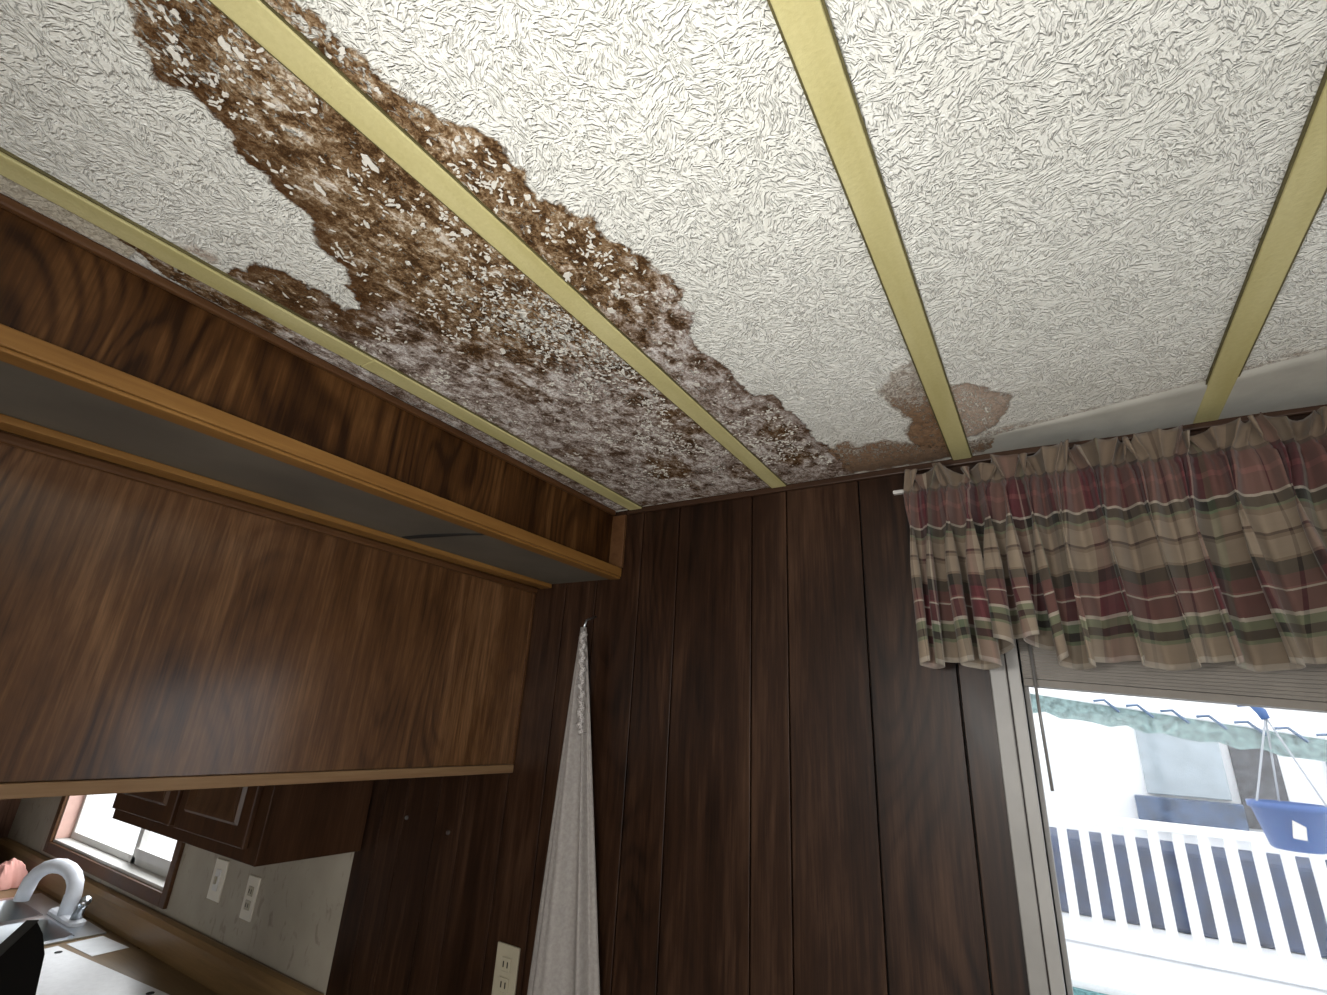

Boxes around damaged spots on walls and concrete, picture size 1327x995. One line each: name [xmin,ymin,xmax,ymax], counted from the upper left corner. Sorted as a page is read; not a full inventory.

leakage [117,0,951,511]
leakage [950,383,1030,454]